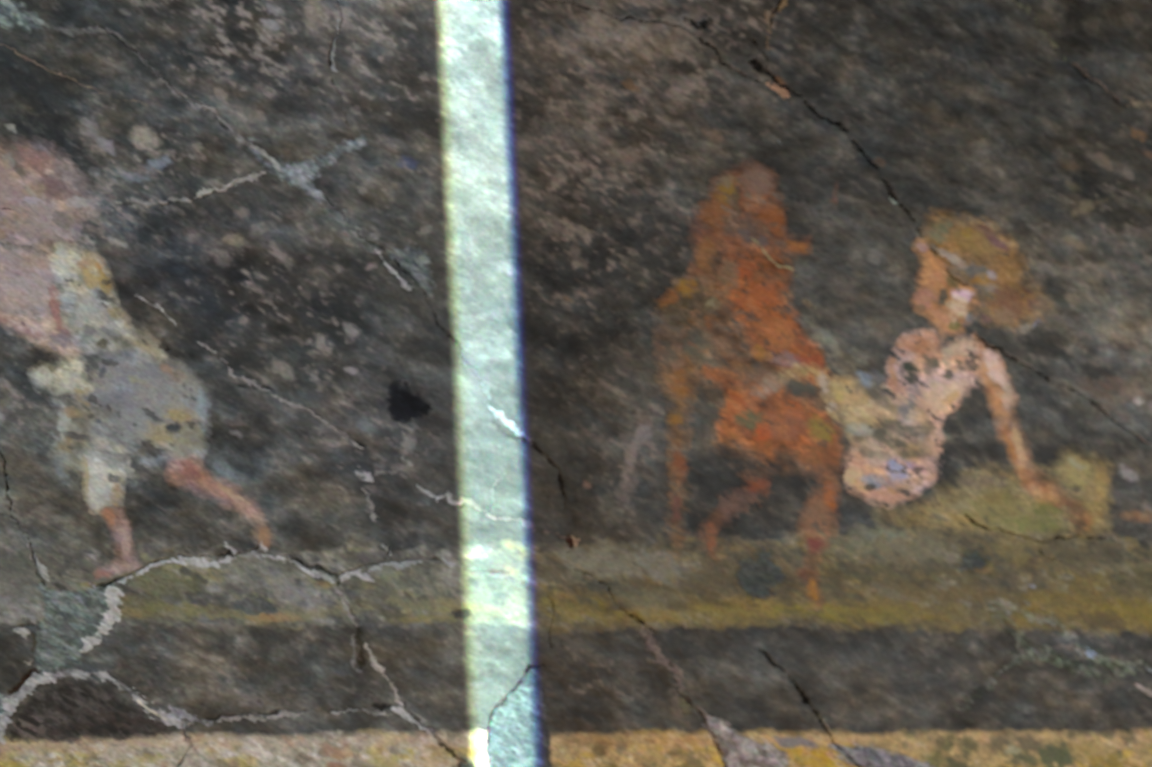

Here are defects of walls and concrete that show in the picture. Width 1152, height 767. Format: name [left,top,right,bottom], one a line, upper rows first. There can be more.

crack [35,18,281,209]
crack [544,0,968,286]
crack [134,293,367,449]
crack [322,195,565,496]
crack [0,450,50,586]
crack [7,614,42,695]
flaking render [79,582,125,653]
flaking render [0,667,213,756]
crack [96,540,554,767]
crack [416,471,732,767]
flaking render [1065,634,1098,659]
flaking render [1134,682,1152,697]